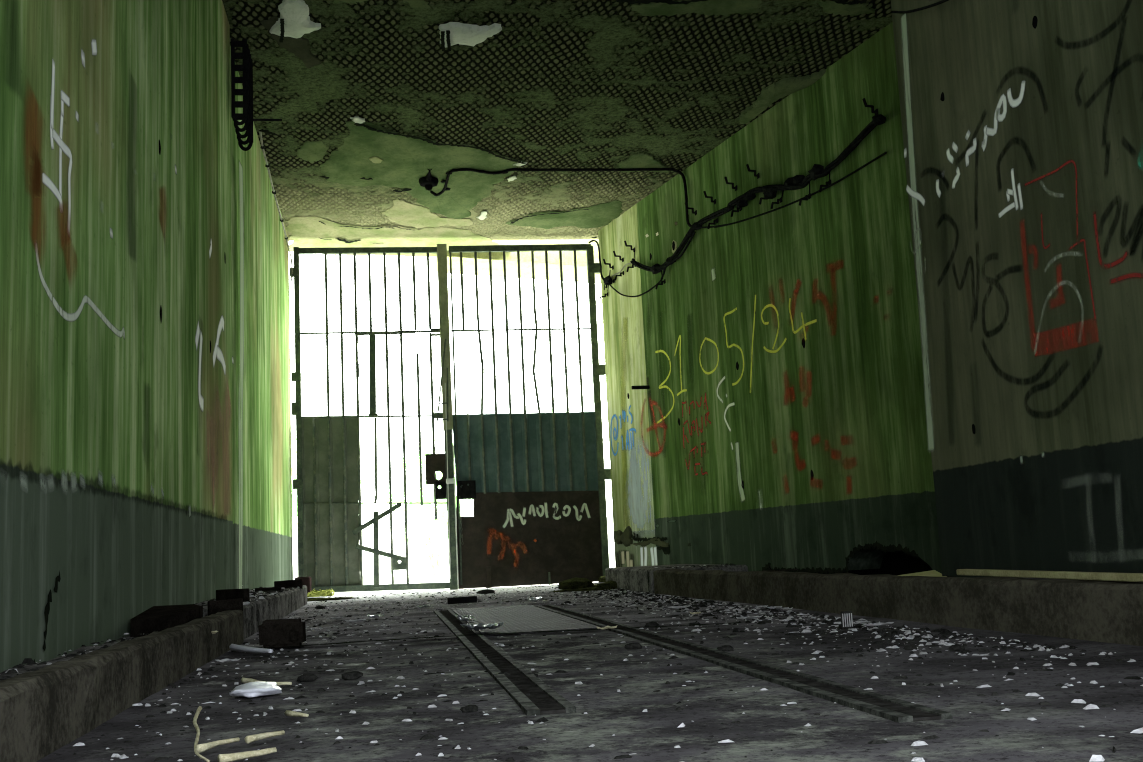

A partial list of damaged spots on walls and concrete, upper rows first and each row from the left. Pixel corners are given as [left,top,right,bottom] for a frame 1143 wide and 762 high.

flaking render [270,0,321,43]
flaking render [630,0,763,17]
flaking render [818,0,876,16]
flaking render [439,22,502,51]
flaking render [285,117,527,257]
flaking render [505,200,623,229]